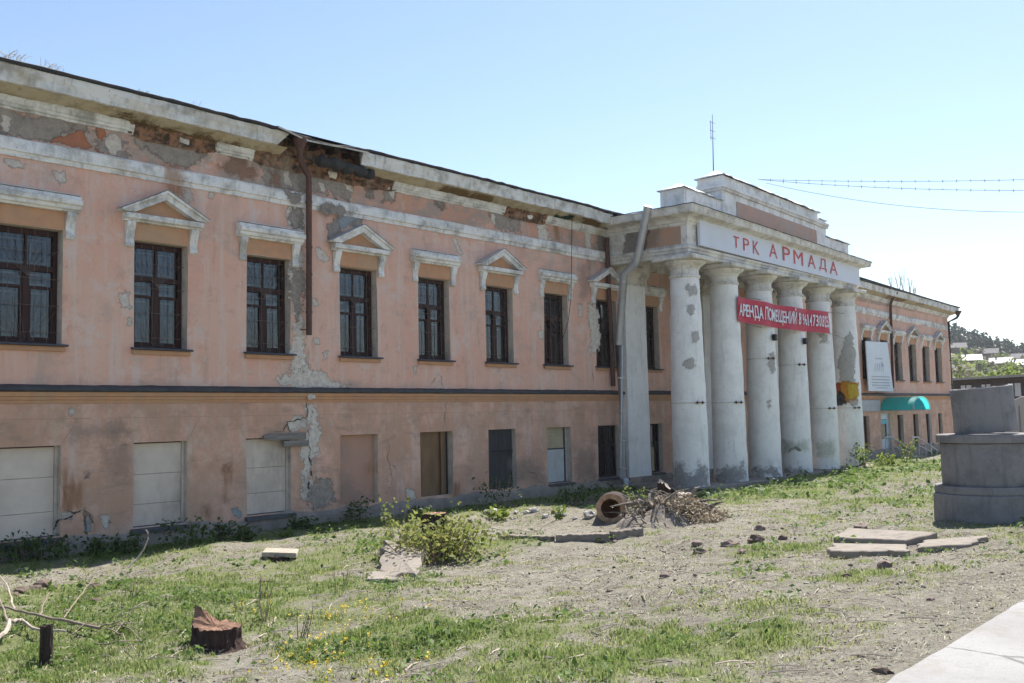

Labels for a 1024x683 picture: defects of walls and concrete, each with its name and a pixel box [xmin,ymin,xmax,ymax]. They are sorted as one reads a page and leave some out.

flaking render [0,108,220,170]
flaking render [248,138,396,511]
flaking render [578,302,601,353]
flaking render [685,284,697,315]
flaking render [837,332,856,382]
crack [53,510,95,531]